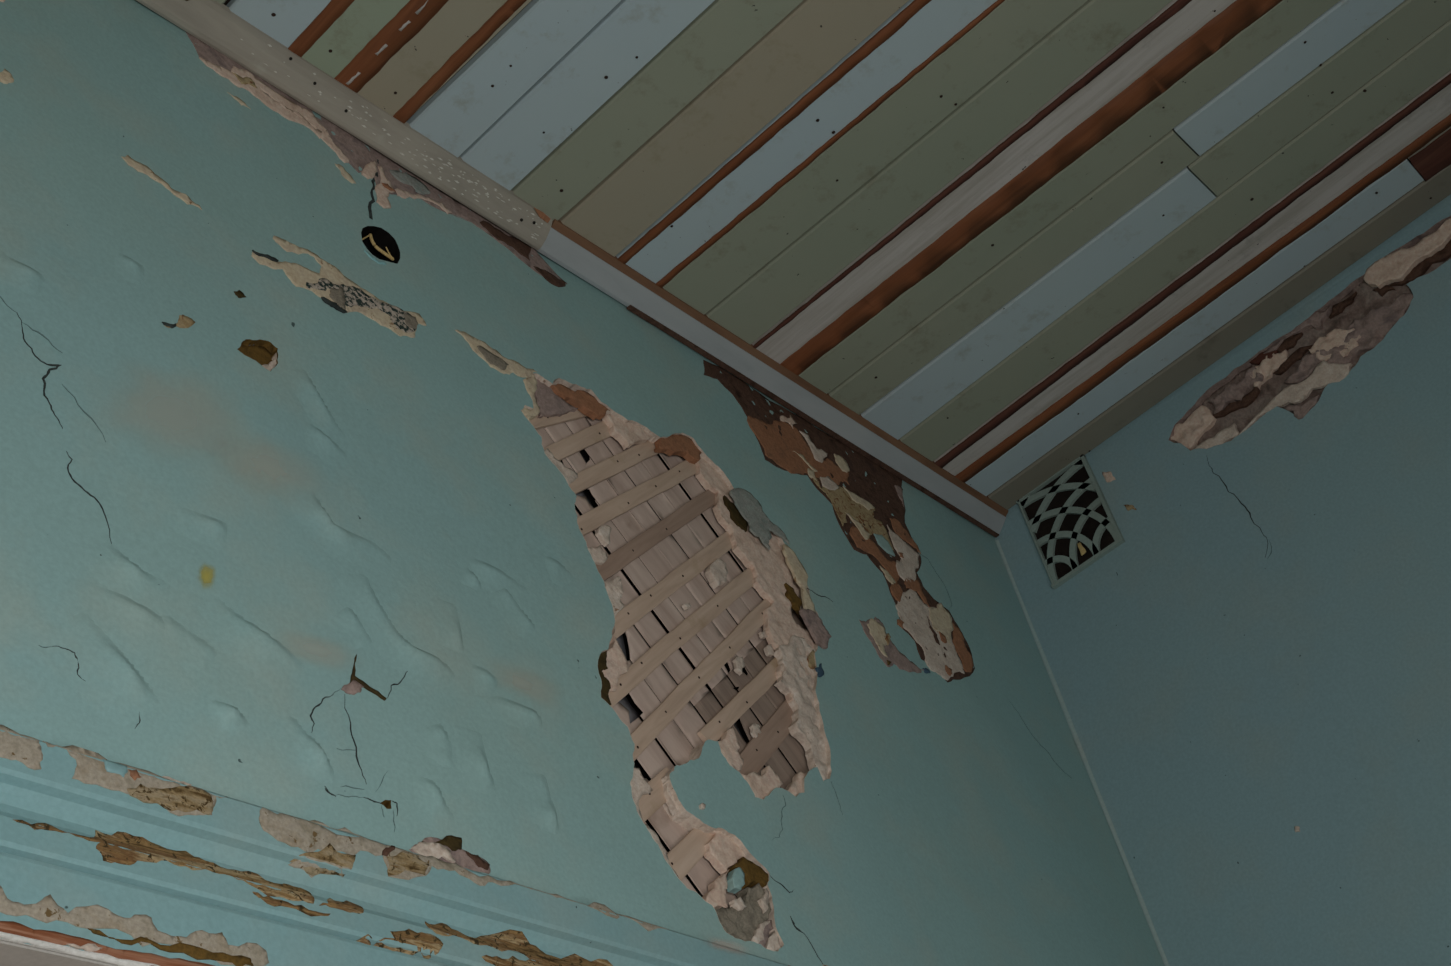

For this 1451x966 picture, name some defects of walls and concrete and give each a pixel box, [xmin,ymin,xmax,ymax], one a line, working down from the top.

peeling [199,57,452,214]
peeling [251,236,427,338]
spalling [361,229,397,263]
spalling [1169,216,1451,451]
crack [0,296,112,544]
peeling [703,360,975,683]
spalling [455,330,832,966]
peeling [0,725,225,816]
crack [310,654,408,832]
peeling [0,886,269,966]
peeling [14,807,669,931]
peeling [357,921,613,966]